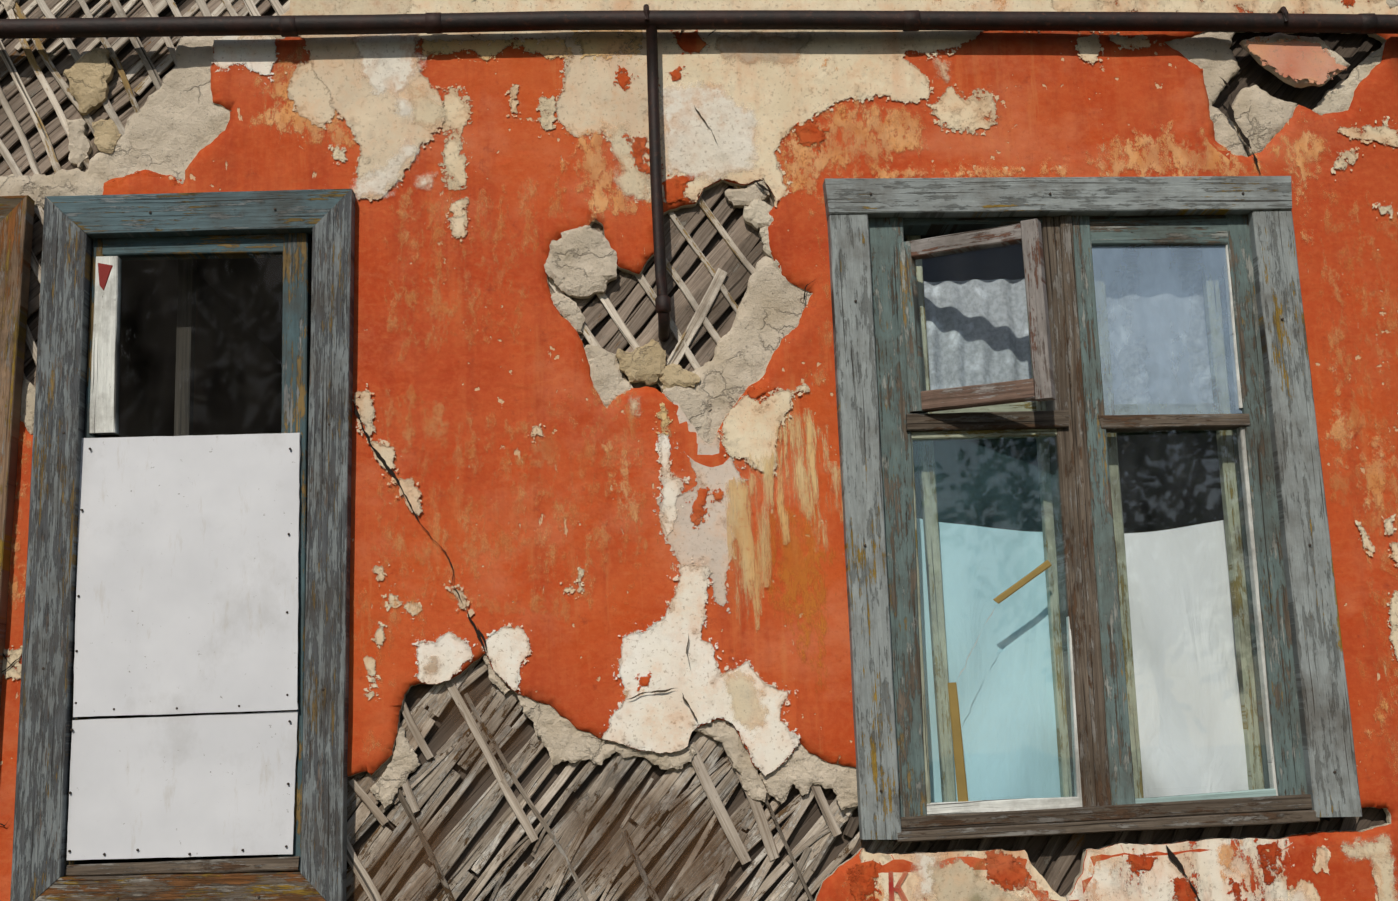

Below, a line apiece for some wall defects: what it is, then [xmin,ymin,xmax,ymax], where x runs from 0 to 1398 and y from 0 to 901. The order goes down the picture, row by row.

peeling [0,0,1398,19]
flaking render [1071,31,1398,205]
flaking render [0,30,651,444]
crack [354,404,487,655]
flaking render [346,30,1321,901]
peeling [1326,387,1353,464]
peeling [1355,436,1398,567]
peeling [2,646,22,683]
peeling [1387,590,1398,661]
crack [1166,845,1201,901]
peeling [1312,808,1398,901]